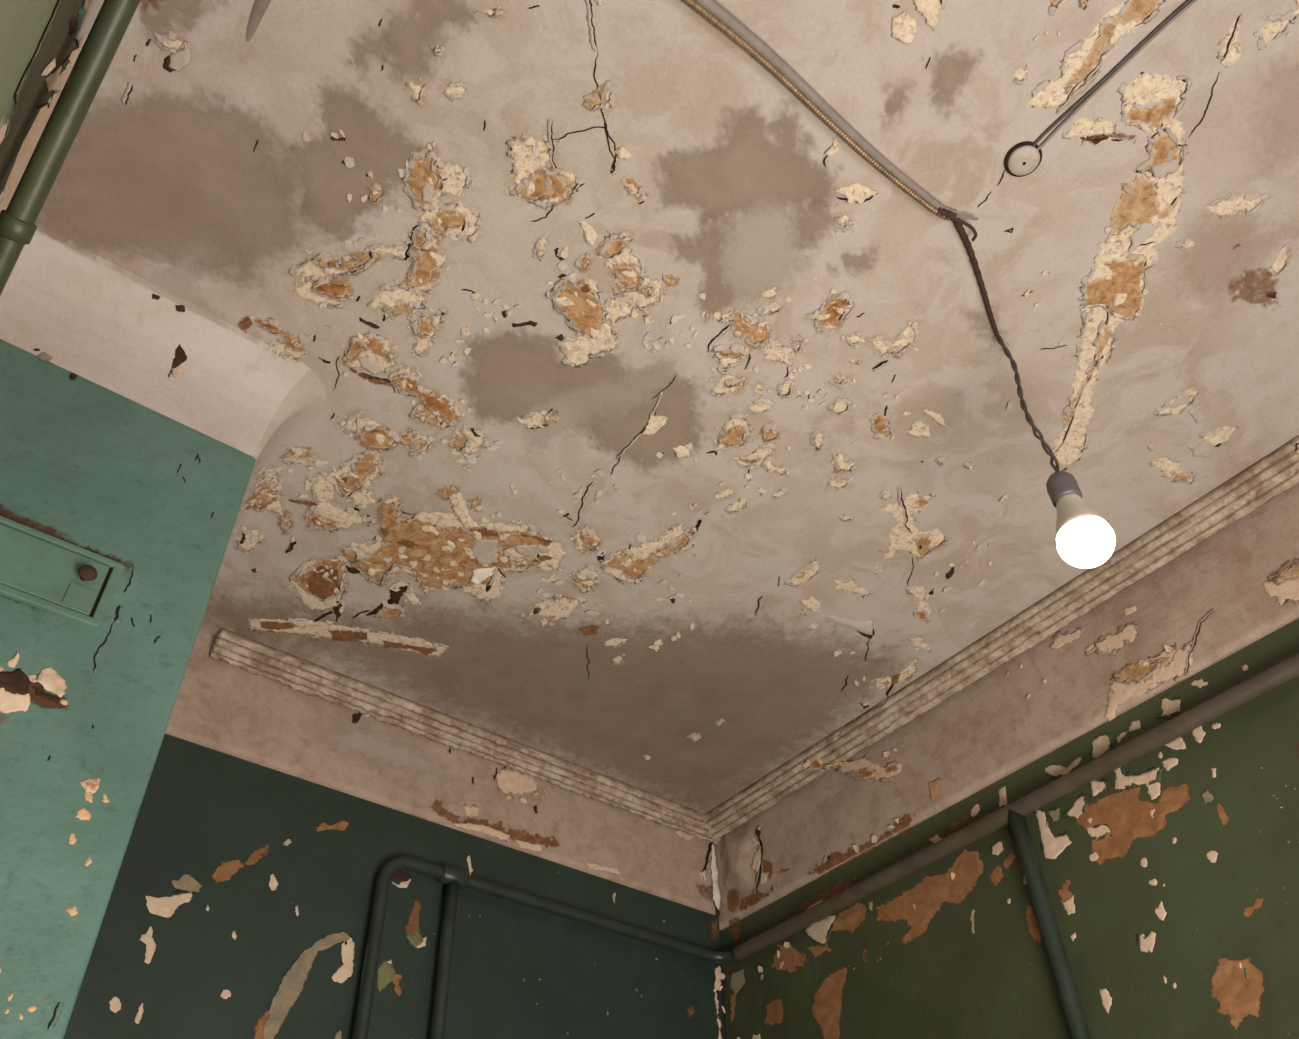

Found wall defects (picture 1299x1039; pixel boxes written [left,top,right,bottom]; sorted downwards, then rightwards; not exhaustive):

leakage [35,91,430,326]
crack [531,0,620,222]
leakage [660,110,835,315]
spalling [1042,72,1194,471]
corrosion [0,504,133,568]
spalling [233,129,920,677]
leakage [460,333,699,464]
crack [565,376,676,528]
leakage [215,598,886,808]
peeling [140,874,202,964]
peeling [254,932,355,1039]
peeling [1034,723,1229,954]